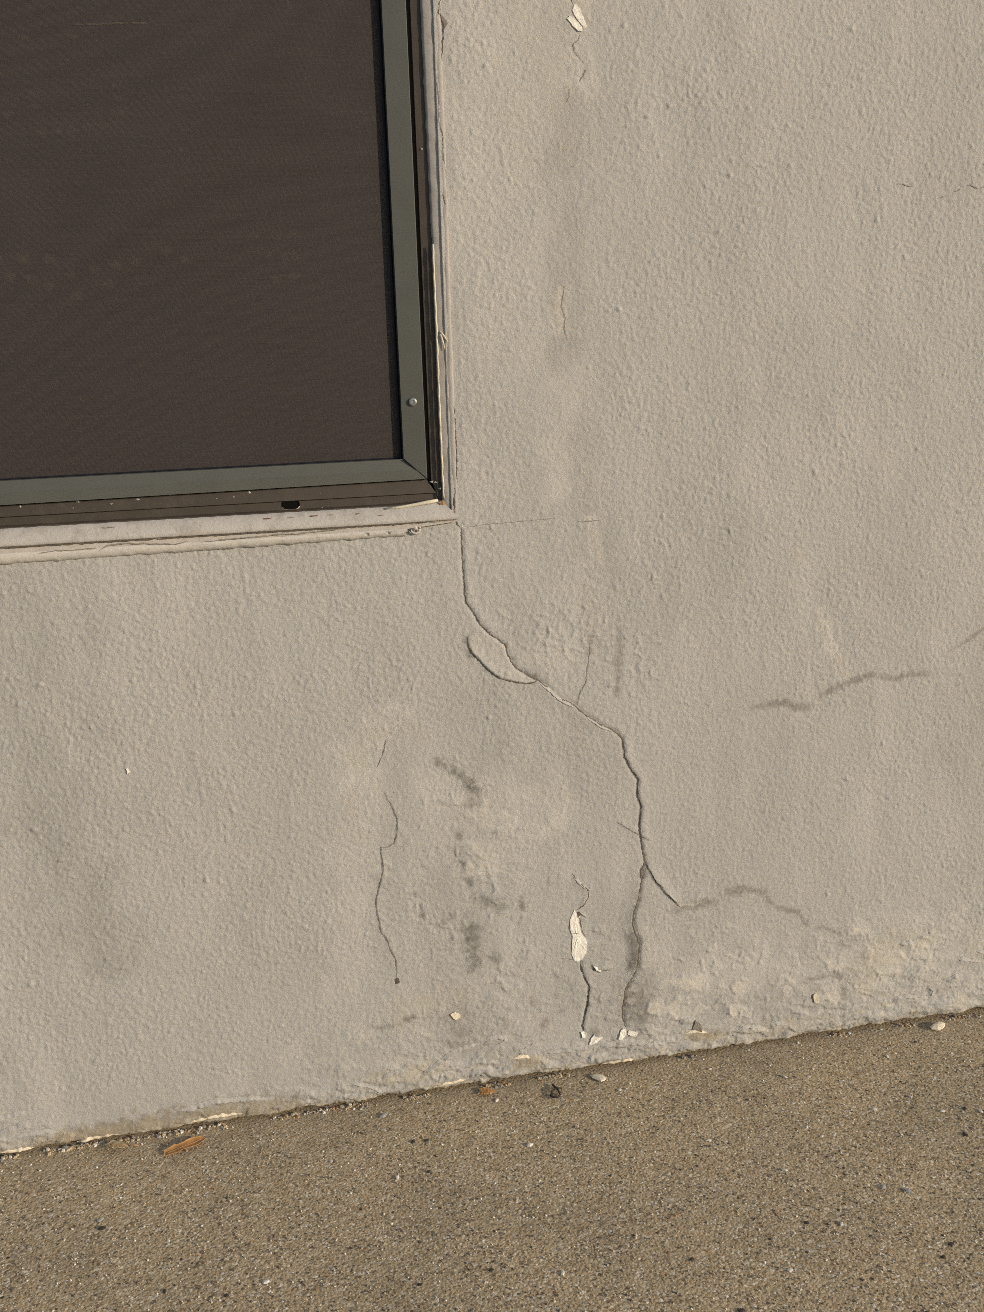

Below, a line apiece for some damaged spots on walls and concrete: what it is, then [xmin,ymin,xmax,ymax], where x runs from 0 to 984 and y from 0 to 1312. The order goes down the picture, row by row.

peeling [567,0,590,31]
crack [454,409,680,1031]
crack [376,740,400,984]
peeling [569,910,587,962]